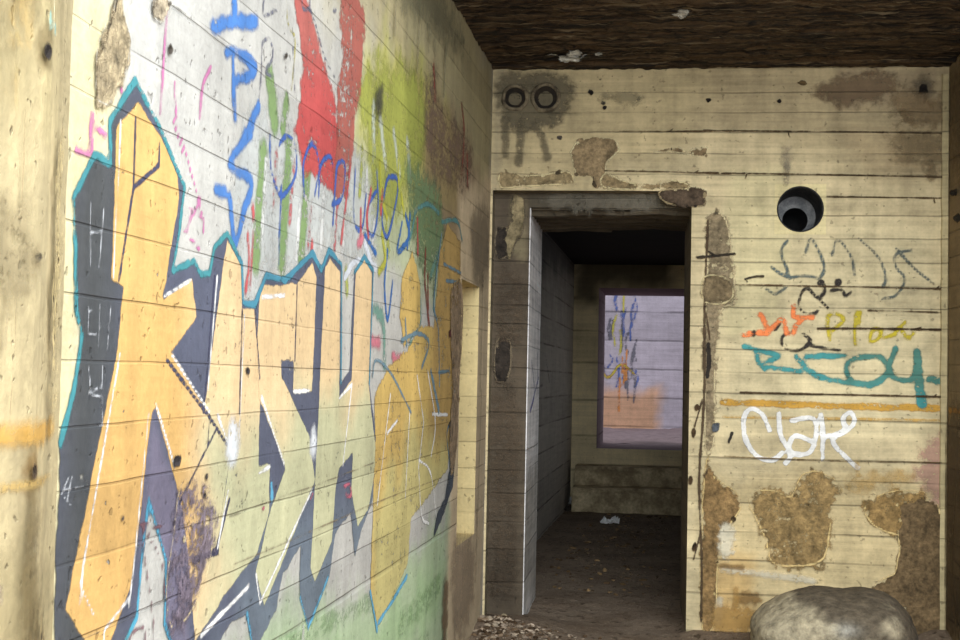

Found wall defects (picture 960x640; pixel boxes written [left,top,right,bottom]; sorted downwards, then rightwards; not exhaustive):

spalling [96,0,131,109]
spalling [153,0,172,22]
leakage [496,71,574,166]
leakage [814,70,942,180]
peeling [493,137,842,631]
spalling [861,488,940,635]